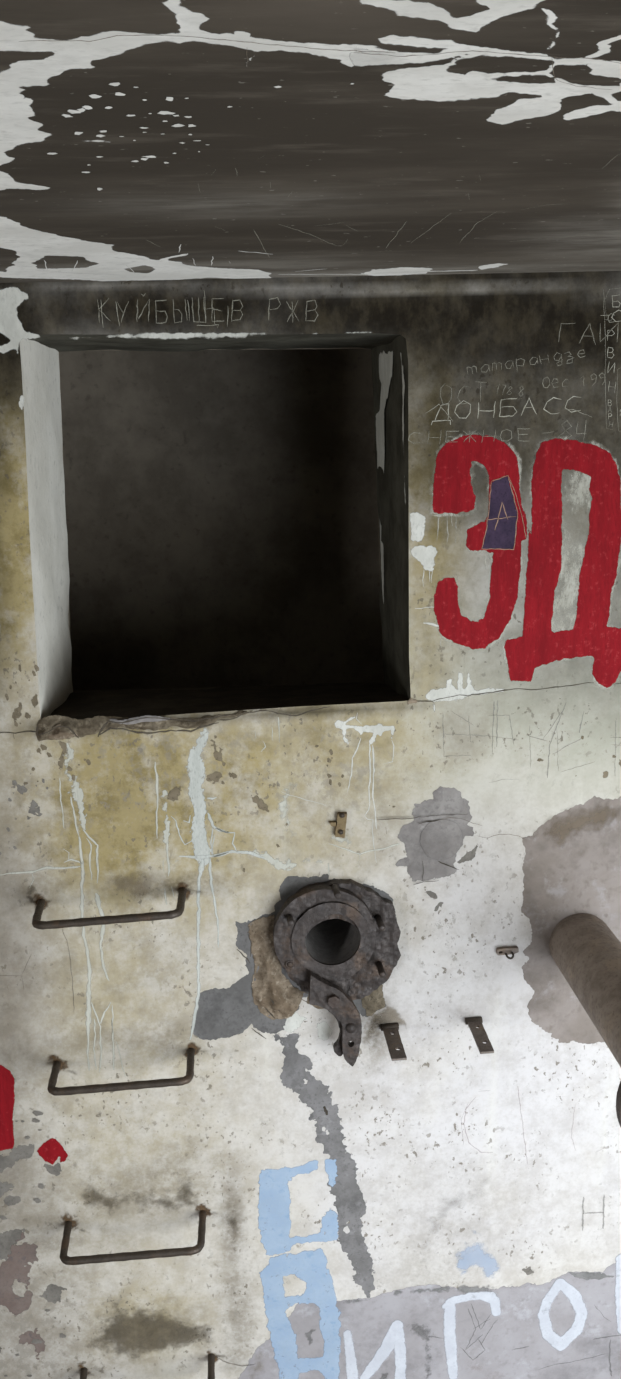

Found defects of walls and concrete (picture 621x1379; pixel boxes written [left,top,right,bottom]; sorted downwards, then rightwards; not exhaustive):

water stain [0,743,125,1075]
water stain [154,729,329,1040]
water stain [331,713,399,863]
peeling [457,845,478,863]
peeling [0,1111,67,1377]